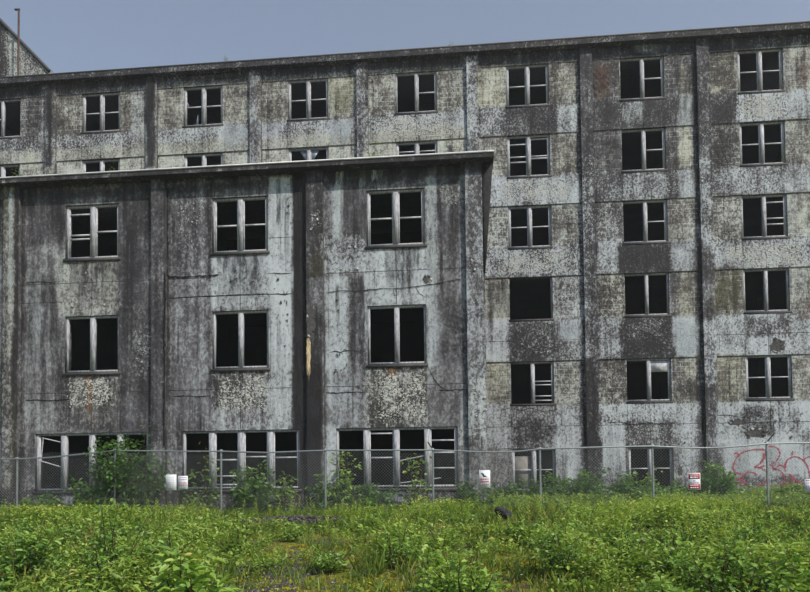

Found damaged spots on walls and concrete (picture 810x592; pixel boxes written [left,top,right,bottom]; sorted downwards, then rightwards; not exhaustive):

damp [285,173,307,323]
damp [295,337,321,461]
spalling [306,301,316,377]